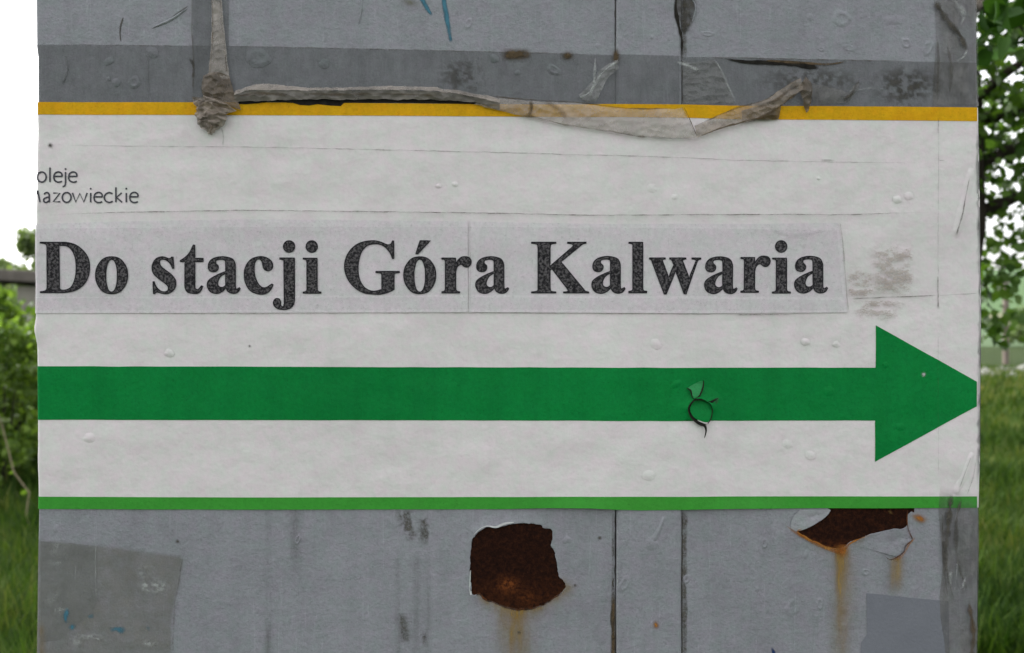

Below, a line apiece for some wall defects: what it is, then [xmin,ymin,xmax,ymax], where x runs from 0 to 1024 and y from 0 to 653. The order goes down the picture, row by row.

corrosion [459,512,577,643]
corrosion [787,508,925,597]